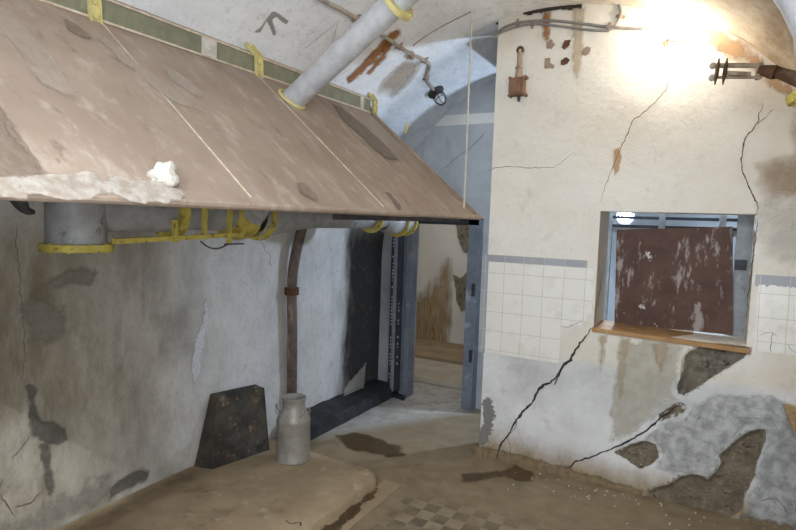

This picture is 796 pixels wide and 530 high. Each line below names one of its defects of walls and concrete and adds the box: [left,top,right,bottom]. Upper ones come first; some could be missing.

corrosion [347,30,400,84]
crack [601,42,695,200]
crack [740,104,771,317]
crack [487,262,604,460]
flaking render [659,345,751,421]
water stain [336,433,405,457]
peeling [479,398,496,445]
water stain [461,446,642,496]
crack [564,404,702,470]
flaking render [615,441,659,469]
flaking render [645,429,766,517]
water stain [741,516,793,530]